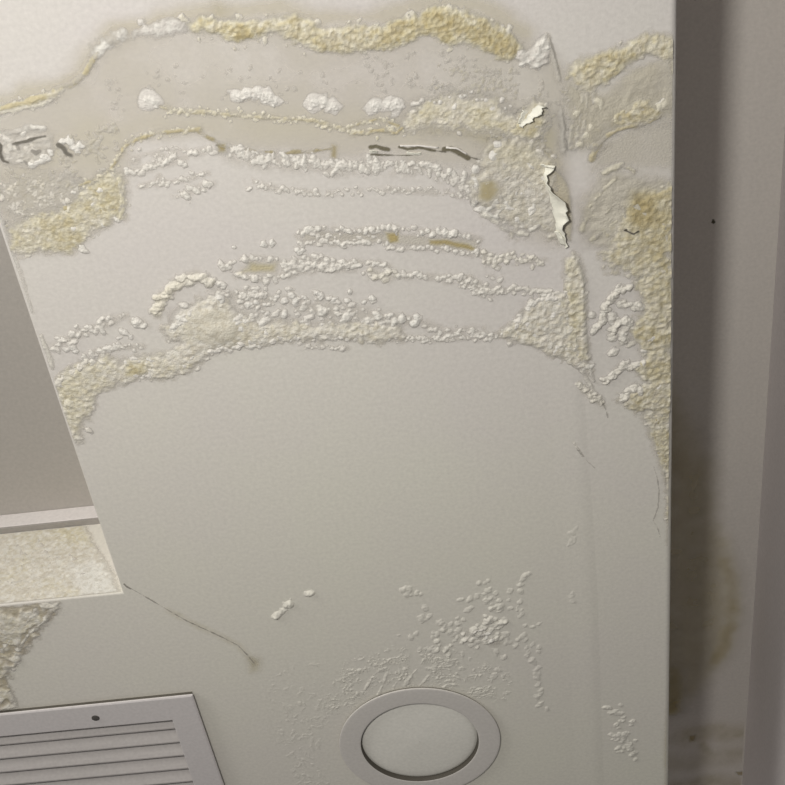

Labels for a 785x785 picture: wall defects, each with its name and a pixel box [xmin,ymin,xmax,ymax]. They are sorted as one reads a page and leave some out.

spalling [0,124,85,169]
water stain [0,0,673,444]
crack [368,144,480,161]
flaking render [466,99,572,249]
spalling [0,601,60,710]